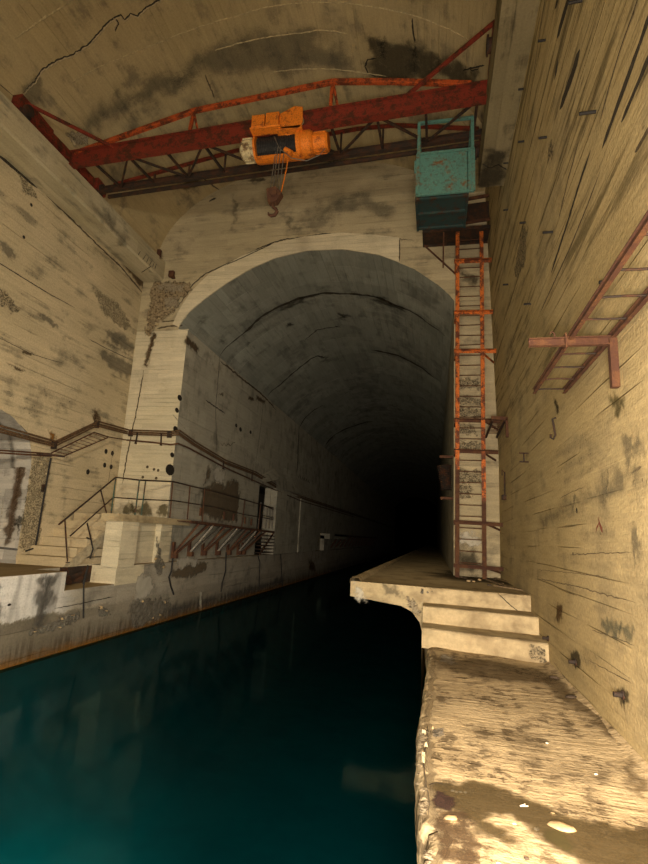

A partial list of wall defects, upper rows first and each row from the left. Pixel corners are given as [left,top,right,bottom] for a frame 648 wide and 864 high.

crack [23,0,163,94]
water stain [369,38,475,82]
spalling [144,280,192,336]
spalling [19,458,50,550]
water stain [0,572,330,670]
water stain [432,781,648,864]